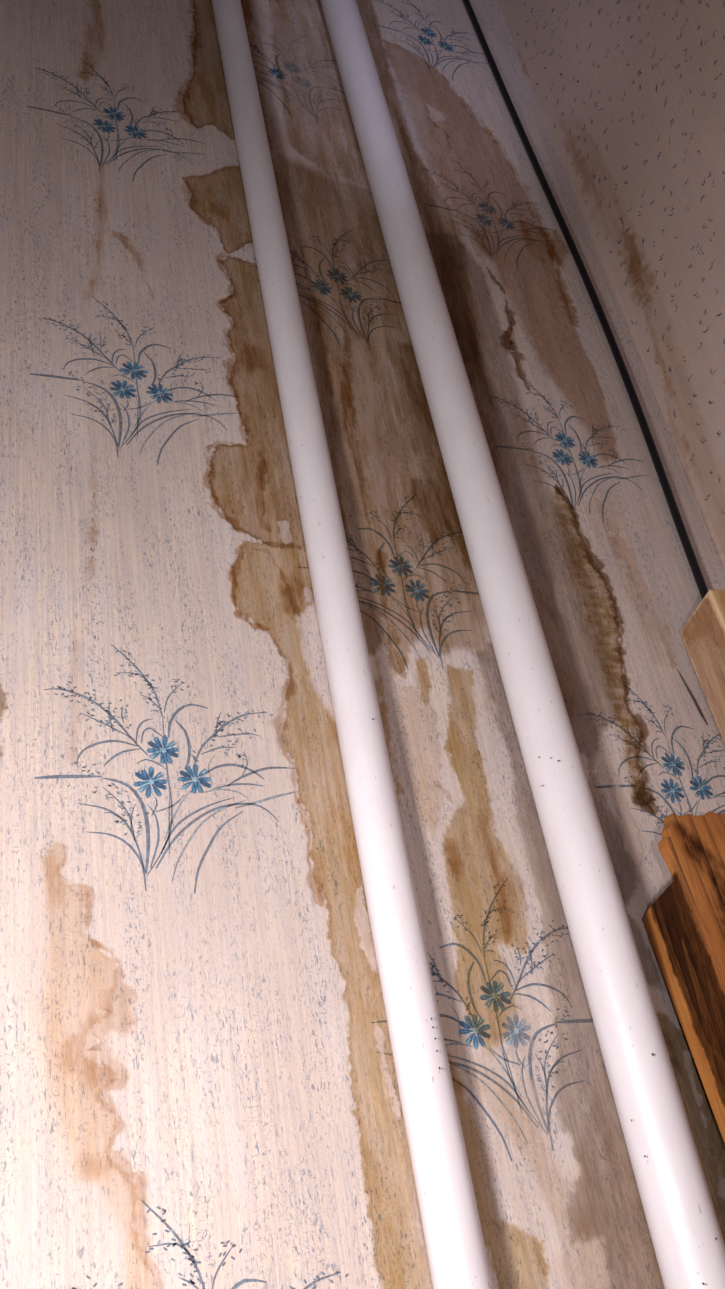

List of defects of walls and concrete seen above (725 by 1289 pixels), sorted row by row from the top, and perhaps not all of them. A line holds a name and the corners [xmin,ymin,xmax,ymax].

damp [277,520,293,545]
damp [611,773,643,866]
damp [354,882,378,972]
damp [650,874,725,1128]
damp [374,1023,401,1118]